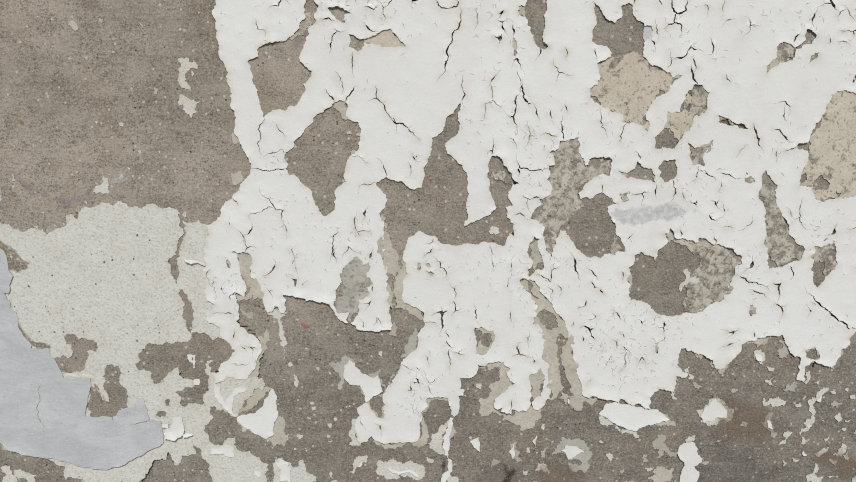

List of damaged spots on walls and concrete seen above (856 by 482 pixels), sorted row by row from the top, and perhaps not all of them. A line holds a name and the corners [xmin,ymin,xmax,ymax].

peeling [590,3,682,131]
peeling [0,0,251,284]
crack [206,0,856,434]
peeling [45,306,98,373]
peeling [87,364,129,417]
peeling [136,81,856,482]
peeling [0,443,84,482]